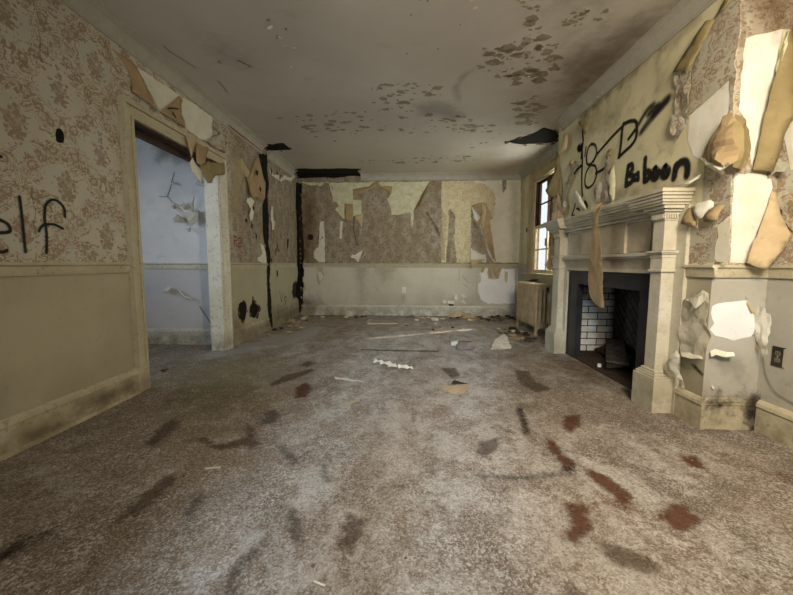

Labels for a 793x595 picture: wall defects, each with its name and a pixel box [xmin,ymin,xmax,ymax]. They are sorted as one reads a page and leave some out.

peeling [476,0,564,86]
peeling [561,8,609,27]
peeling [371,83,495,164]
peeling [504,95,548,146]
crack [258,154,273,328]
crack [296,183,305,313]
peeling [476,267,515,304]
peeling [666,290,772,389]